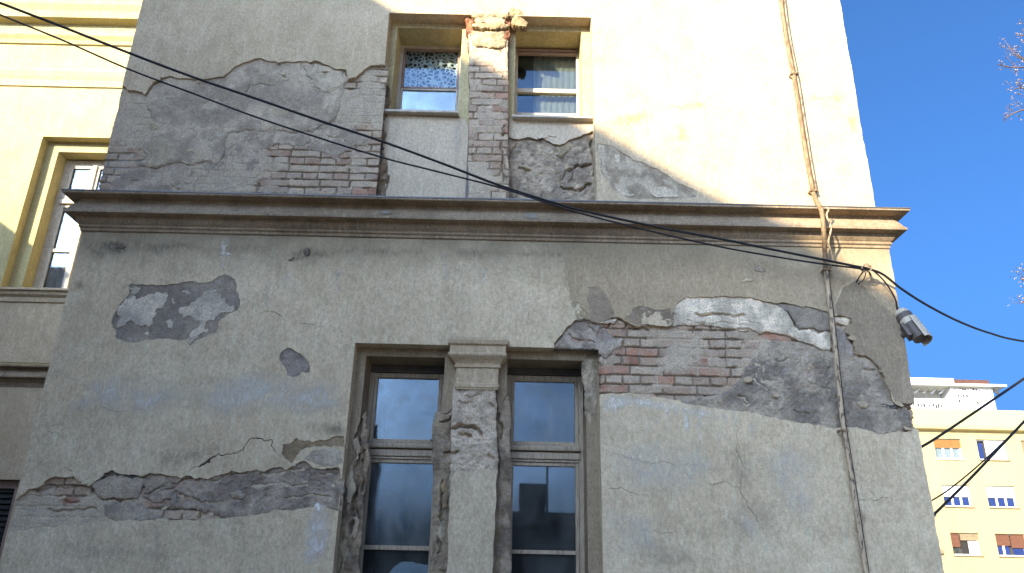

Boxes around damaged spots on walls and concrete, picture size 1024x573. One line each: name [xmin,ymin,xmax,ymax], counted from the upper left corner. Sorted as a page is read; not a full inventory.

flaking render [99,59,392,196]
flaking render [465,8,697,200]
peeling [112,275,240,346]
peeling [279,348,310,377]
flaking render [554,287,914,435]
flaking render [8,411,371,573]
crack [198,438,279,467]
flaking render [429,387,512,573]